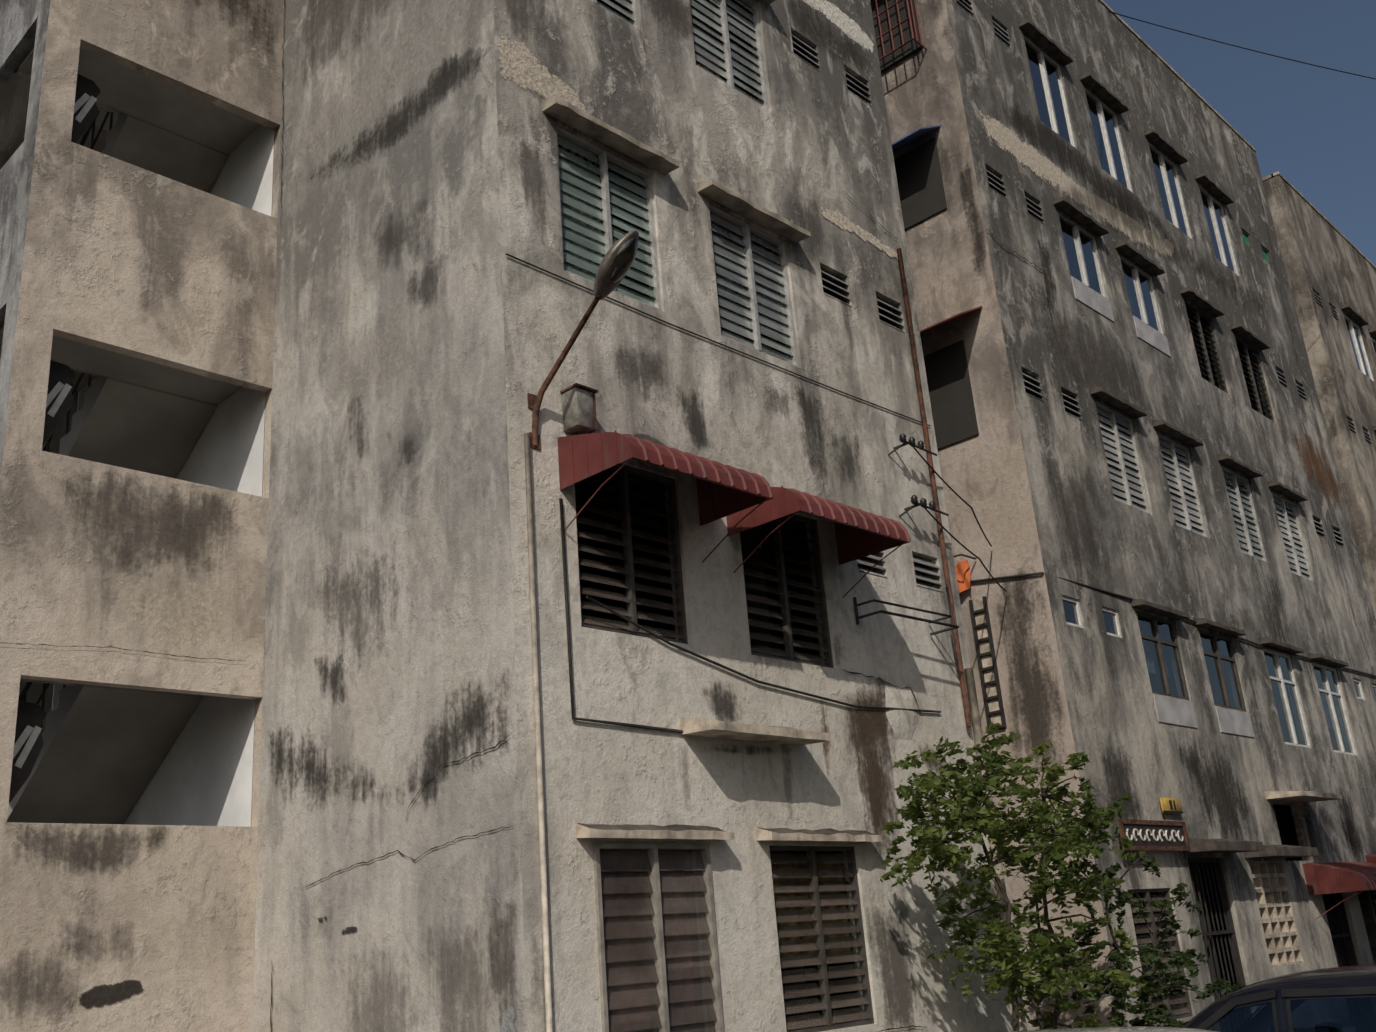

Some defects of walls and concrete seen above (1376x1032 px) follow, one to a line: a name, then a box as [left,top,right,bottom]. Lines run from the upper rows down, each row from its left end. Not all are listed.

spalling [802,0,874,52]
water stain [320,51,479,173]
peeling [499,36,587,113]
water stain [413,268,436,302]
water stain [84,472,227,565]
water stain [320,660,344,700]
water stain [271,731,374,801]
water stain [409,685,506,800]
water stain [25,827,163,869]
crack [302,732,513,888]
water stain [7,961,71,1010]
water stain [870,912,914,1032]